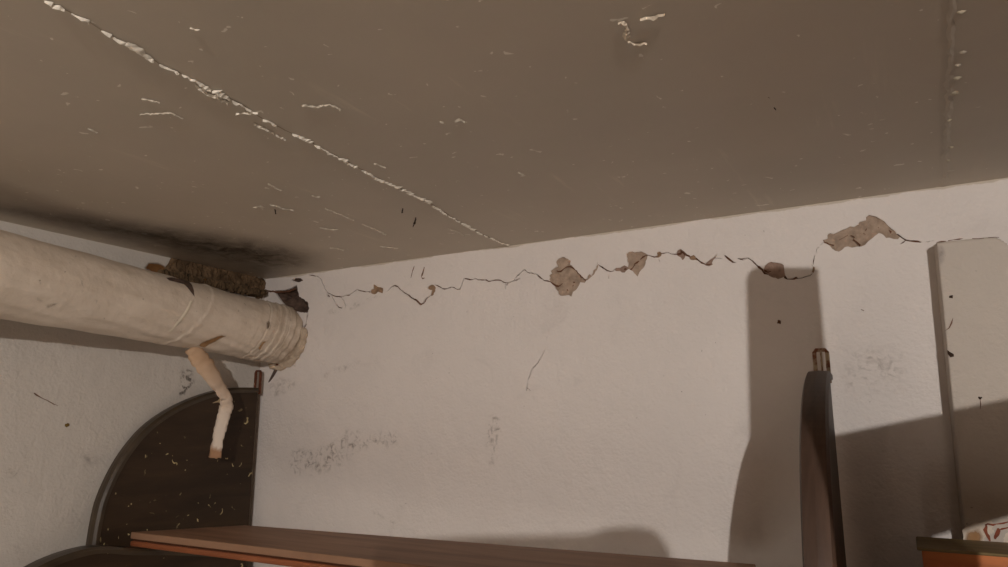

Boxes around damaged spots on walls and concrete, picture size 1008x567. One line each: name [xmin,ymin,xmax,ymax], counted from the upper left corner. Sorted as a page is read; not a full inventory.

peeling [618,21,647,46]
water stain [110,227,287,265]
flaking render [823,215,900,252]
crack [889,230,999,244]
water stain [146,263,165,272]
crack [393,270,549,305]
flaking render [549,257,598,296]
flaking render [615,252,662,277]
crack [648,252,815,280]